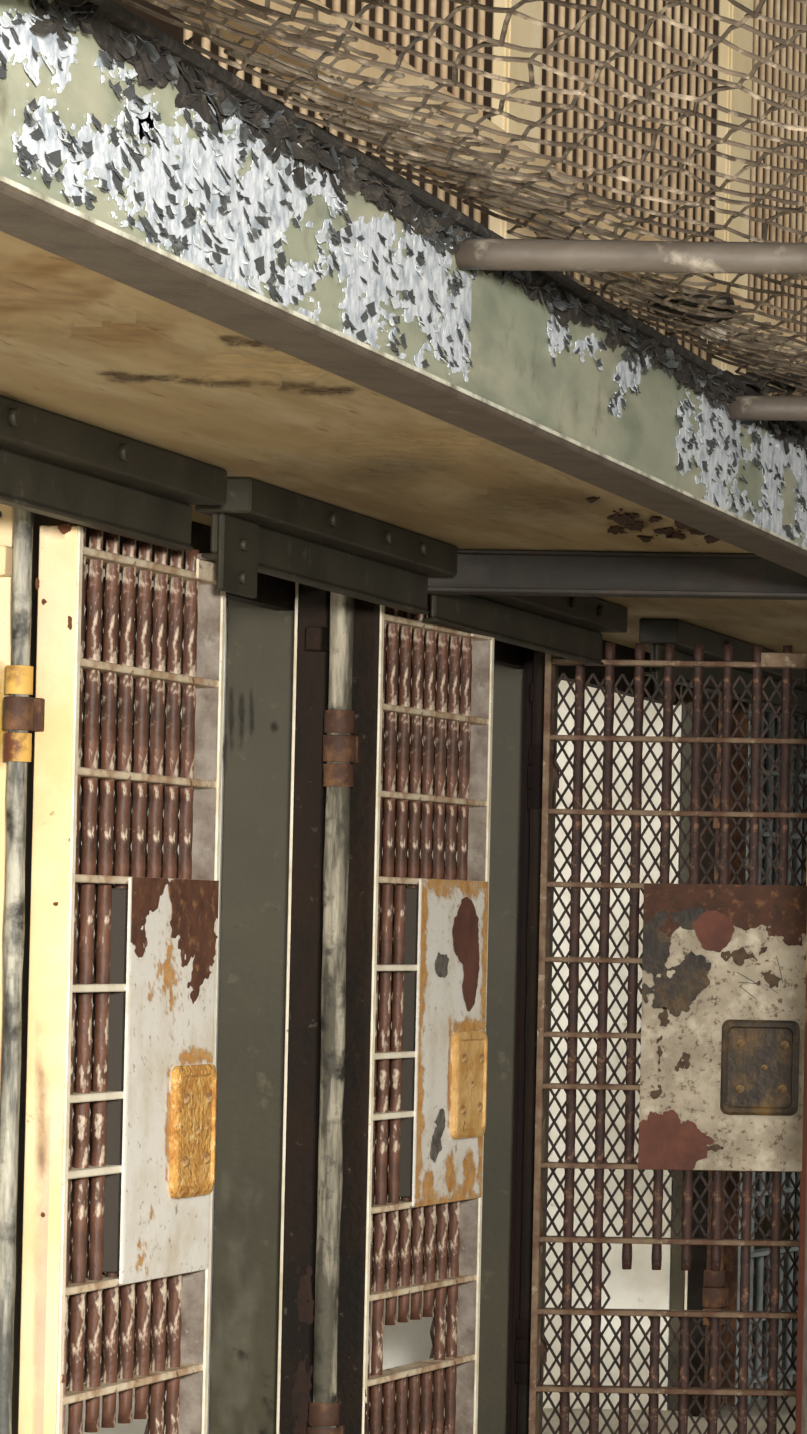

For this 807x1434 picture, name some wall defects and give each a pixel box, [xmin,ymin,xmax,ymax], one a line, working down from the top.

peeling [0,0,807,547]
corrosion [131,877,219,1011]
corrosion [415,879,489,1207]
corrosion [642,883,807,1017]